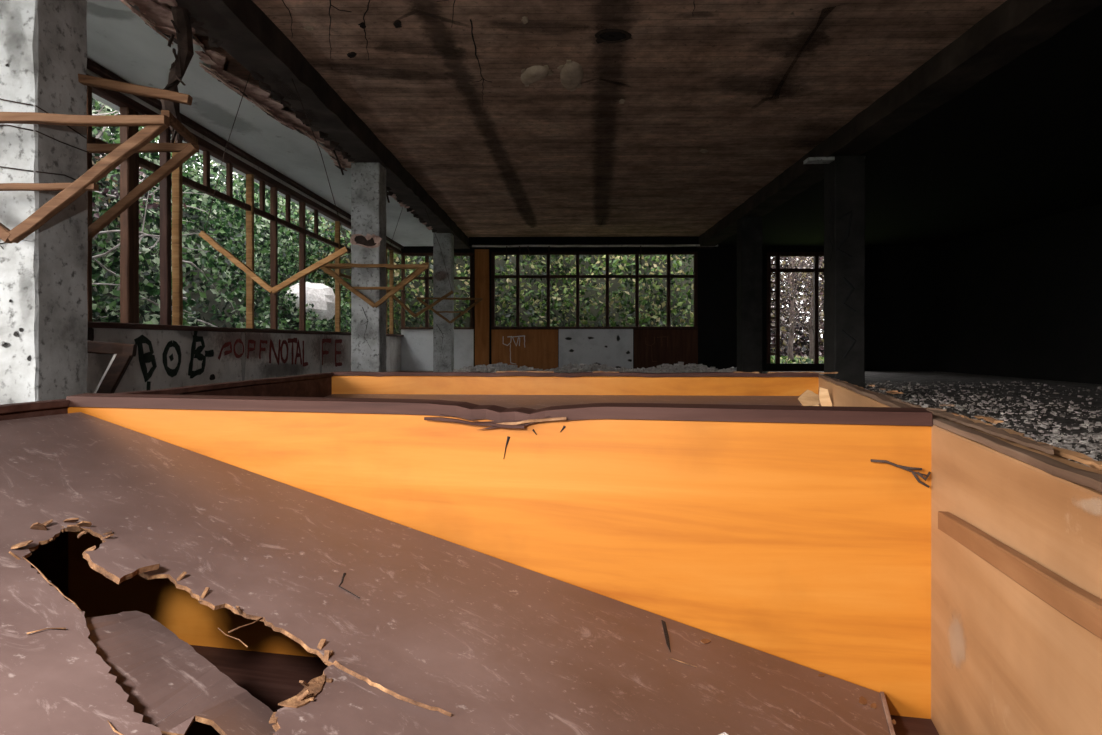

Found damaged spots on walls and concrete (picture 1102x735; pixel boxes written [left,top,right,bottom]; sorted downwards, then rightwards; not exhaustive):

flaking render [120,0,355,171]
crack [504,426,565,457]